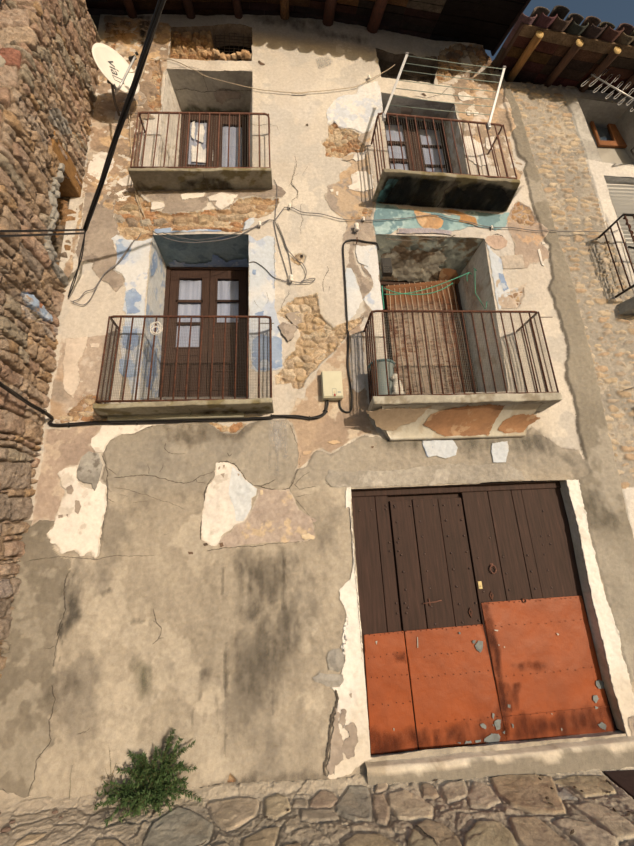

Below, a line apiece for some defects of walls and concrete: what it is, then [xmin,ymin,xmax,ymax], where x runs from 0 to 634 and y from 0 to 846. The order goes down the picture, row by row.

peeling [31,15,550,558]
water stain [59,595,79,636]
crack [3,426,329,797]
water stain [241,566,276,636]
peeling [327,708,358,775]